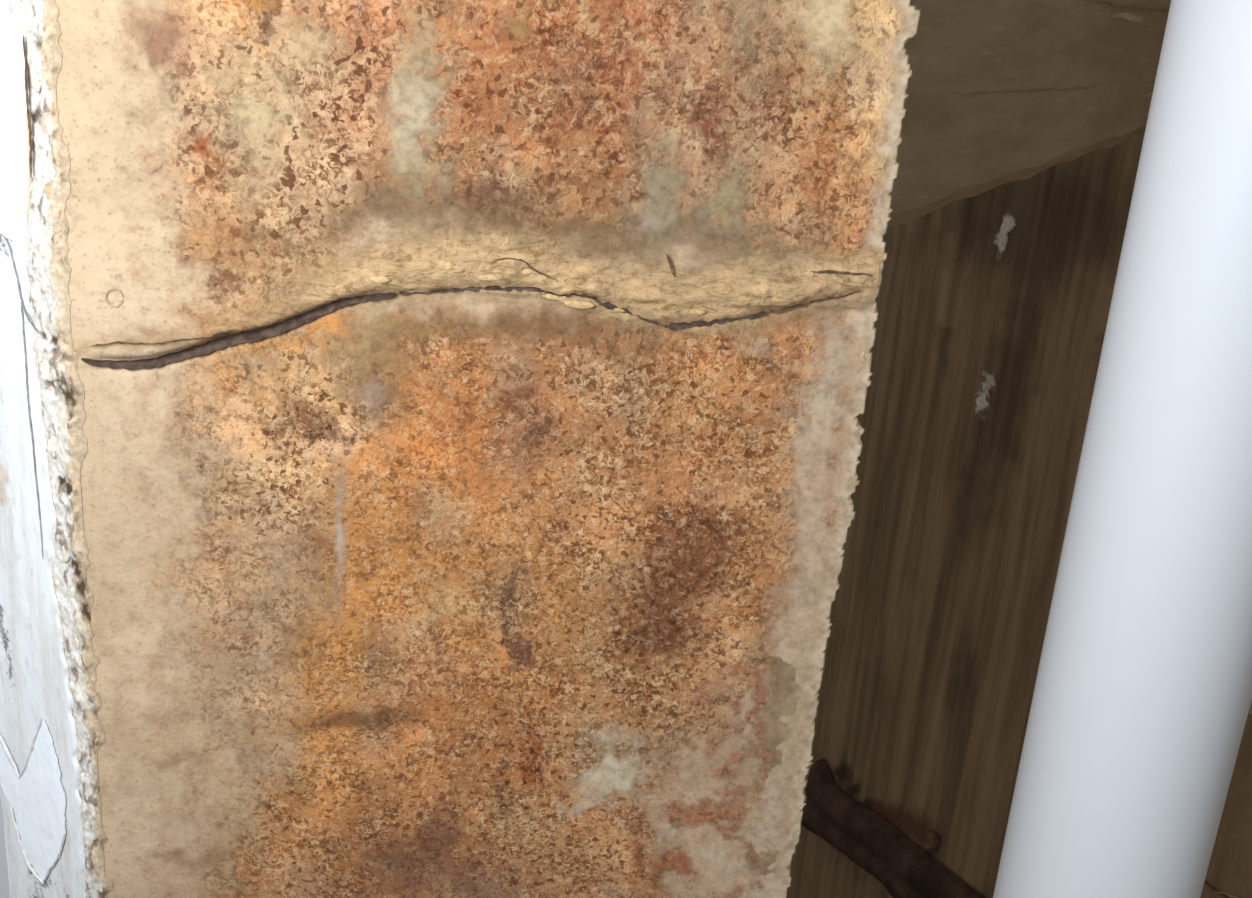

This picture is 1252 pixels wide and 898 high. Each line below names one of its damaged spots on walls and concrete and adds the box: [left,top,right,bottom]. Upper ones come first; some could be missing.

crack [81,258,872,370]
crack [666,254,675,277]
spalling [0,0,112,898]
corrosion [146,0,909,898]
leakage [613,496,741,669]
leakage [775,332,843,684]
leakage [571,756,631,813]
leakage [752,748,787,898]